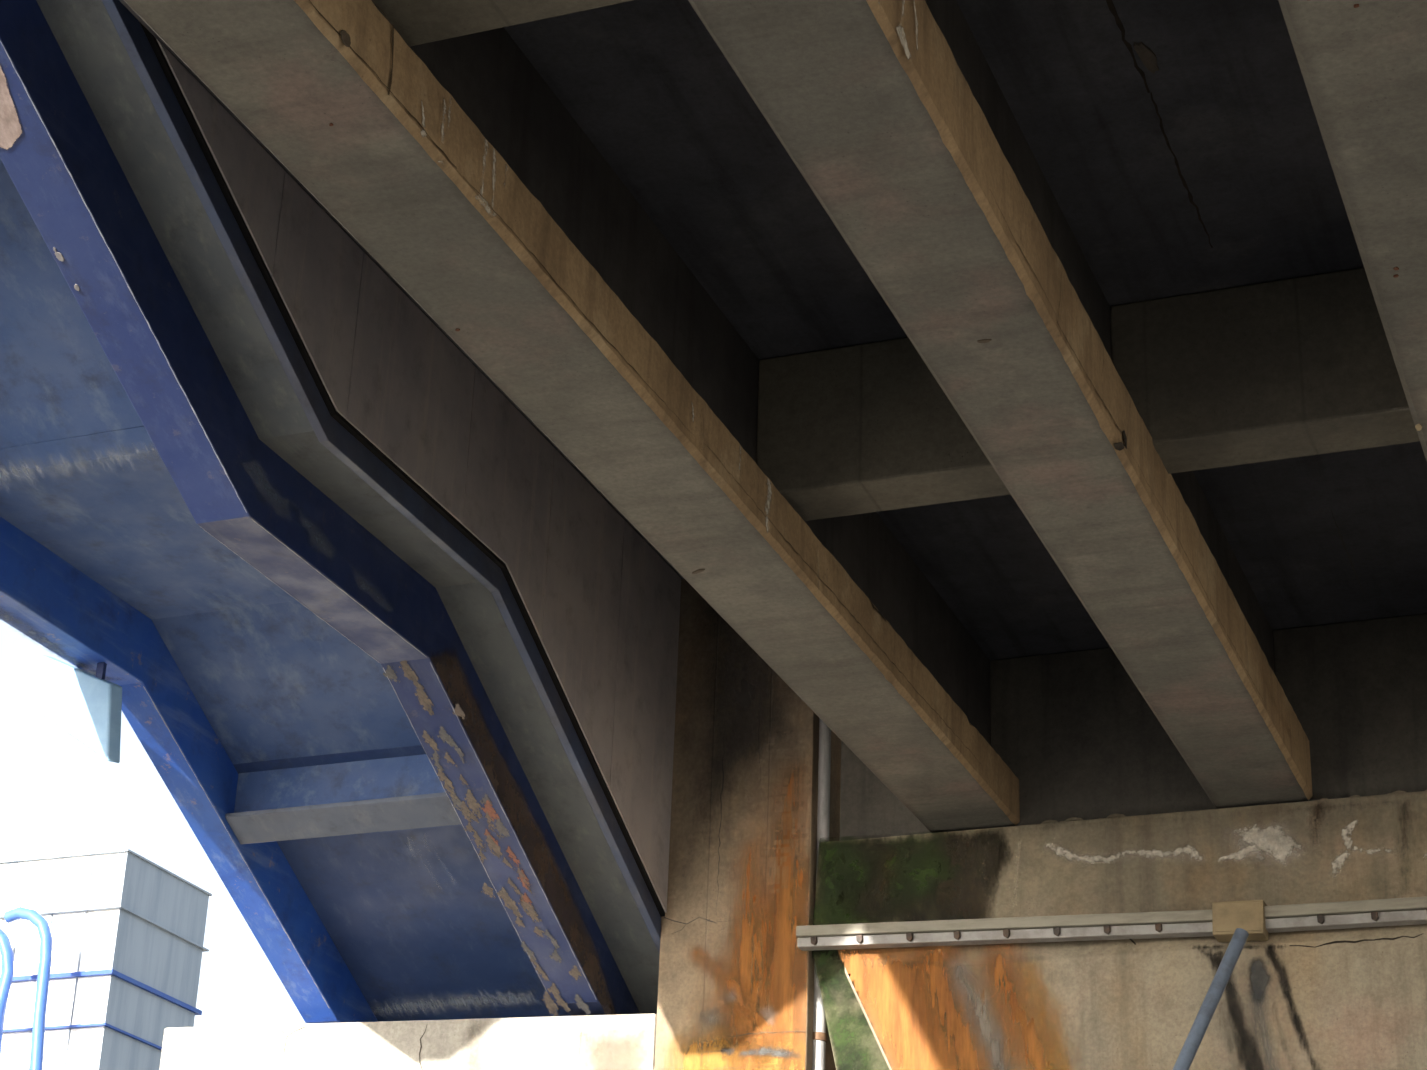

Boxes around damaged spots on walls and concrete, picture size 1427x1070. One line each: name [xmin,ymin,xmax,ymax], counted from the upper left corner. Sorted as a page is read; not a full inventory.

peeling [0,66,22,149]
crack [1106,0,1213,248]
efflorescence [1046,843,1202,863]
efflorescence [1219,824,1301,866]
water stain [1332,820,1391,874]
rust [674,767,807,1070]
rust [837,946,1065,1070]
water stain [953,962,1007,1070]
water stain [1203,945,1315,1070]